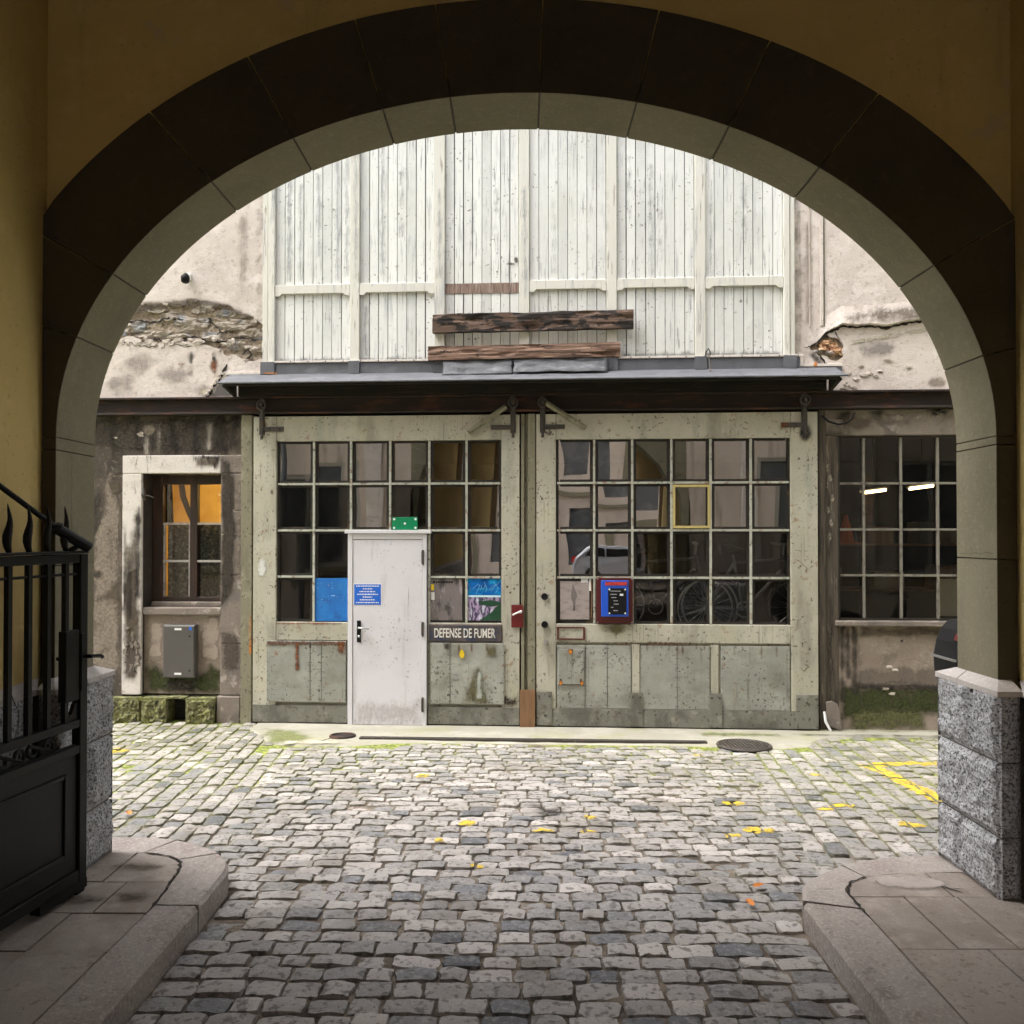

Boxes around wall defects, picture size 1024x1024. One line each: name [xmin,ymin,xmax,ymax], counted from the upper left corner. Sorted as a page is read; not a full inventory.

flaking render [118,299,263,361]
flaking render [809,336,843,364]
peeling [840,343,894,390]
leakage [95,415,241,603]
leakage [93,474,140,670]
corrosion [267,641,345,653]
crack [145,852,182,909]
crack [846,876,871,918]